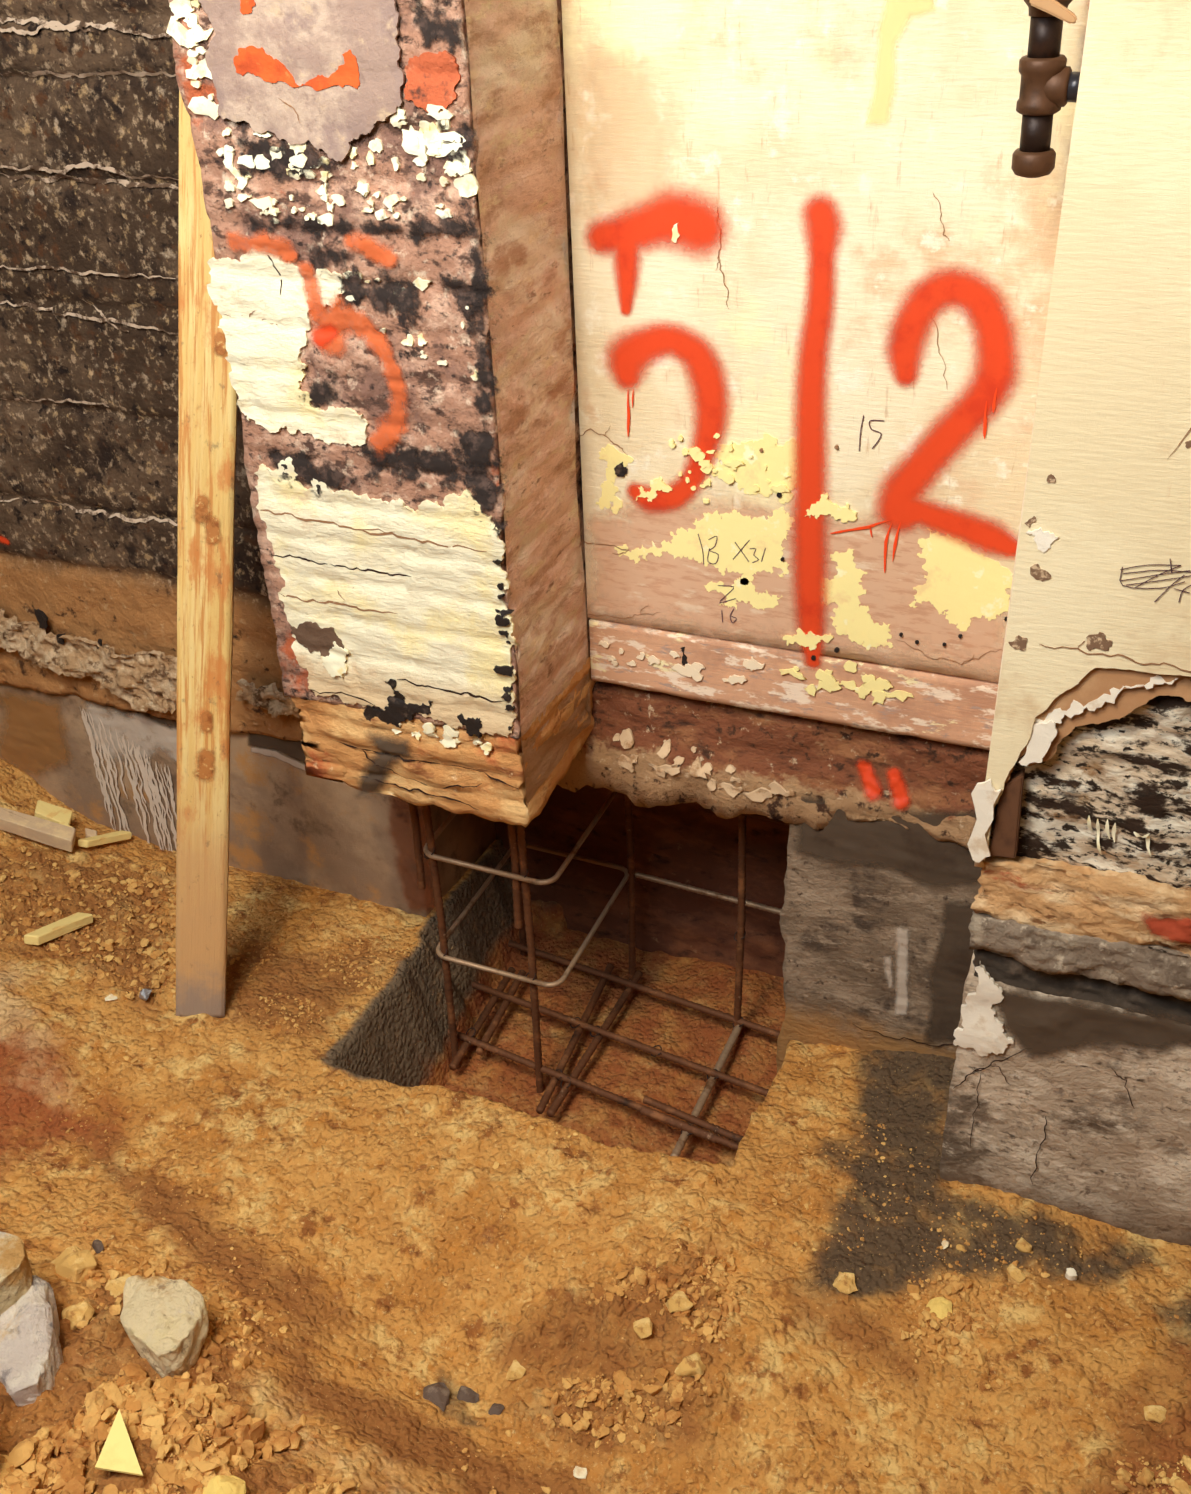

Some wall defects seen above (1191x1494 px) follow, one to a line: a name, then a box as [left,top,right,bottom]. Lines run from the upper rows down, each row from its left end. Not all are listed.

spalling [166,0,480,226]
peeling [403,277,432,291]
peeling [379,328,448,366]
peeling [255,457,519,755]
peeling [591,433,1059,705]
spalling [0,608,177,714]
spalling [235,679,299,718]
leakage [79,705,177,852]
spalling [1011,695,1191,888]
spalling [953,962,1014,1056]
crack [1030,1117,1047,1184]